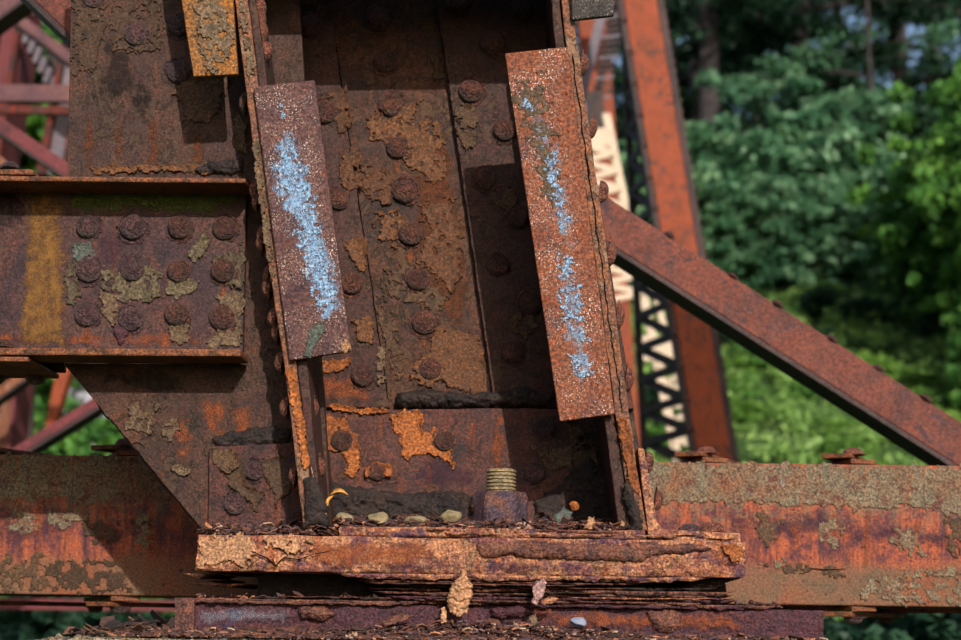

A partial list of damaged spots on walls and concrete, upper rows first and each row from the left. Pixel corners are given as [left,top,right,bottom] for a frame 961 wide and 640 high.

peeling [171,0,255,123]
peeling [366,97,448,184]
rust [1,193,97,346]
peeling [99,262,199,326]
peeling [303,147,488,394]
rust [408,138,469,325]
peeling [285,366,310,470]
peeling [326,403,456,478]
peeling [0,552,133,596]
peeling [0,451,170,556]
peeling [196,511,631,570]
peeling [616,417,961,609]